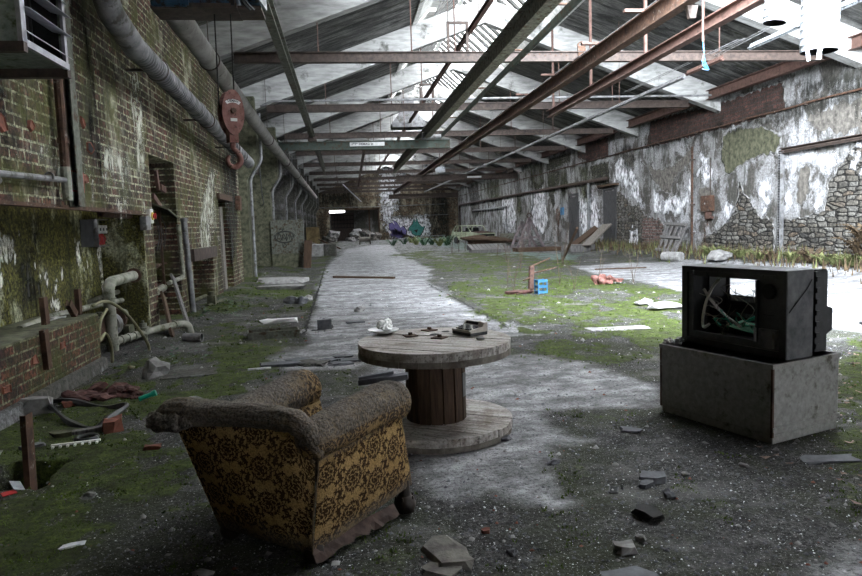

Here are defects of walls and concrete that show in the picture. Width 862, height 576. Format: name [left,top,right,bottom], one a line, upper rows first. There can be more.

leakage [97,76,144,186]
flaking render [646,80,862,261]